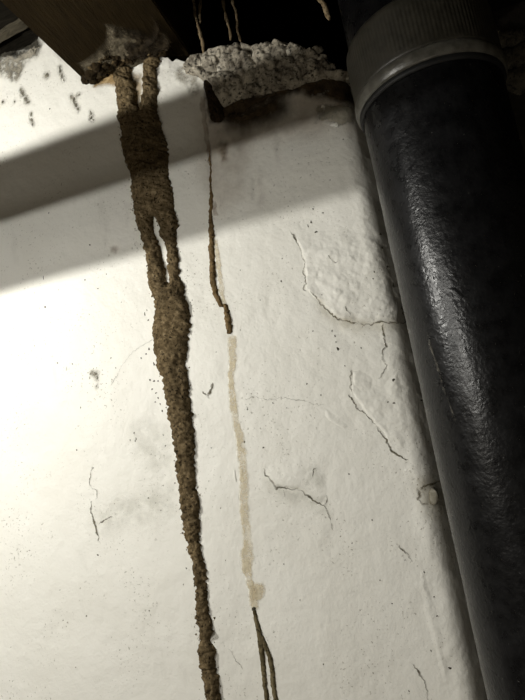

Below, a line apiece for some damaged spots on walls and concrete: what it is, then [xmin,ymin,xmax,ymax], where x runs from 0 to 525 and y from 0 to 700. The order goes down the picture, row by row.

spalling [177,39,355,127]
crack [302,263,406,374]
leakage [228,337,237,411]
crack [348,373,407,460]
crack [264,472,331,521]
leakage [242,541,263,607]